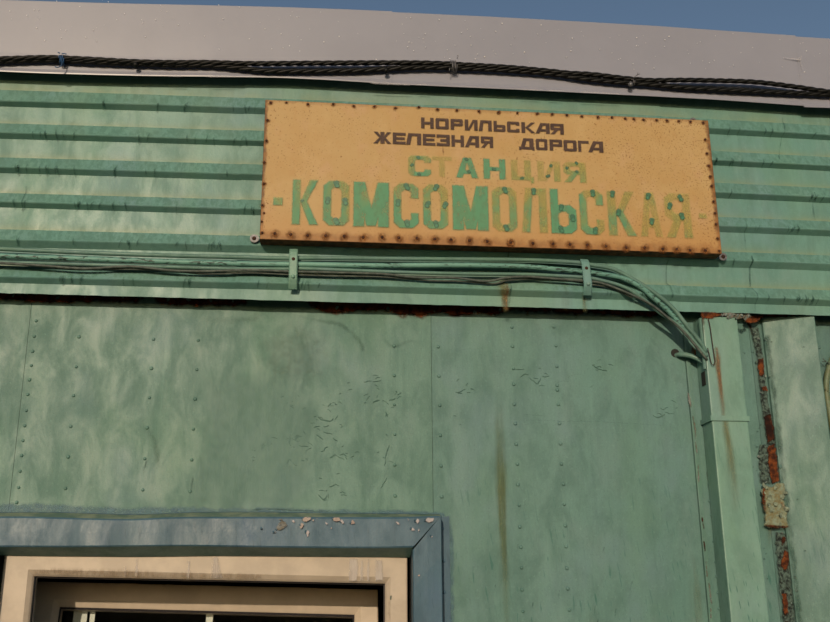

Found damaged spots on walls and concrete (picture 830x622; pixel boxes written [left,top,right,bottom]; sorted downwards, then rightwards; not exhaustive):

corrosion [0,293,143,304]
corrosion [155,297,247,307]
corrosion [745,314,806,335]
corrosion [764,414,779,483]
corrosion [781,537,789,570]